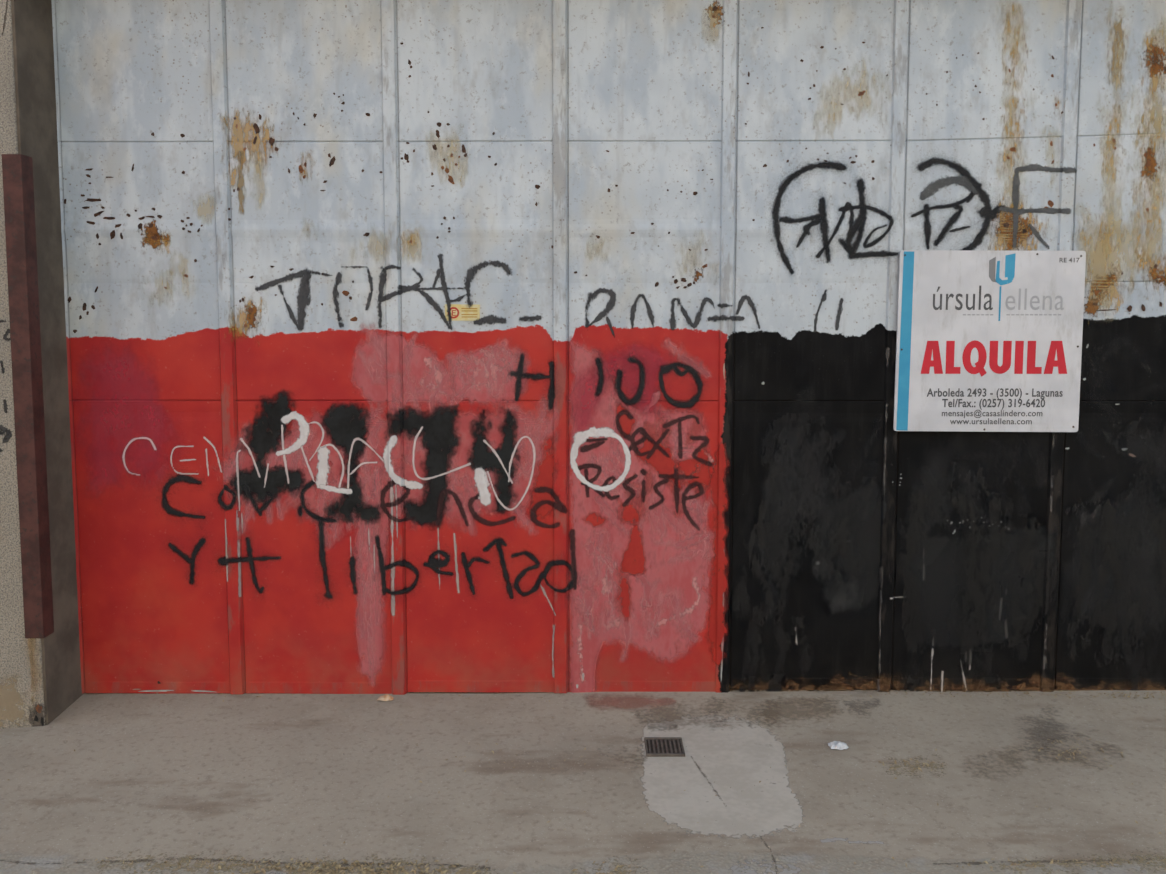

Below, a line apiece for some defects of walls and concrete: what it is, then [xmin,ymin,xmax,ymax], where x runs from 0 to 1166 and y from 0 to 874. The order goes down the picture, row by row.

rust [1111,20,1124,81]
rust [224,113,278,221]
rust [431,133,467,187]
rust [1003,85,1019,165]
rust [1093,118,1119,178]
rust [1135,38,1166,285]
rust [141,220,170,249]
rust [1082,223,1124,315]
rust [232,299,262,334]